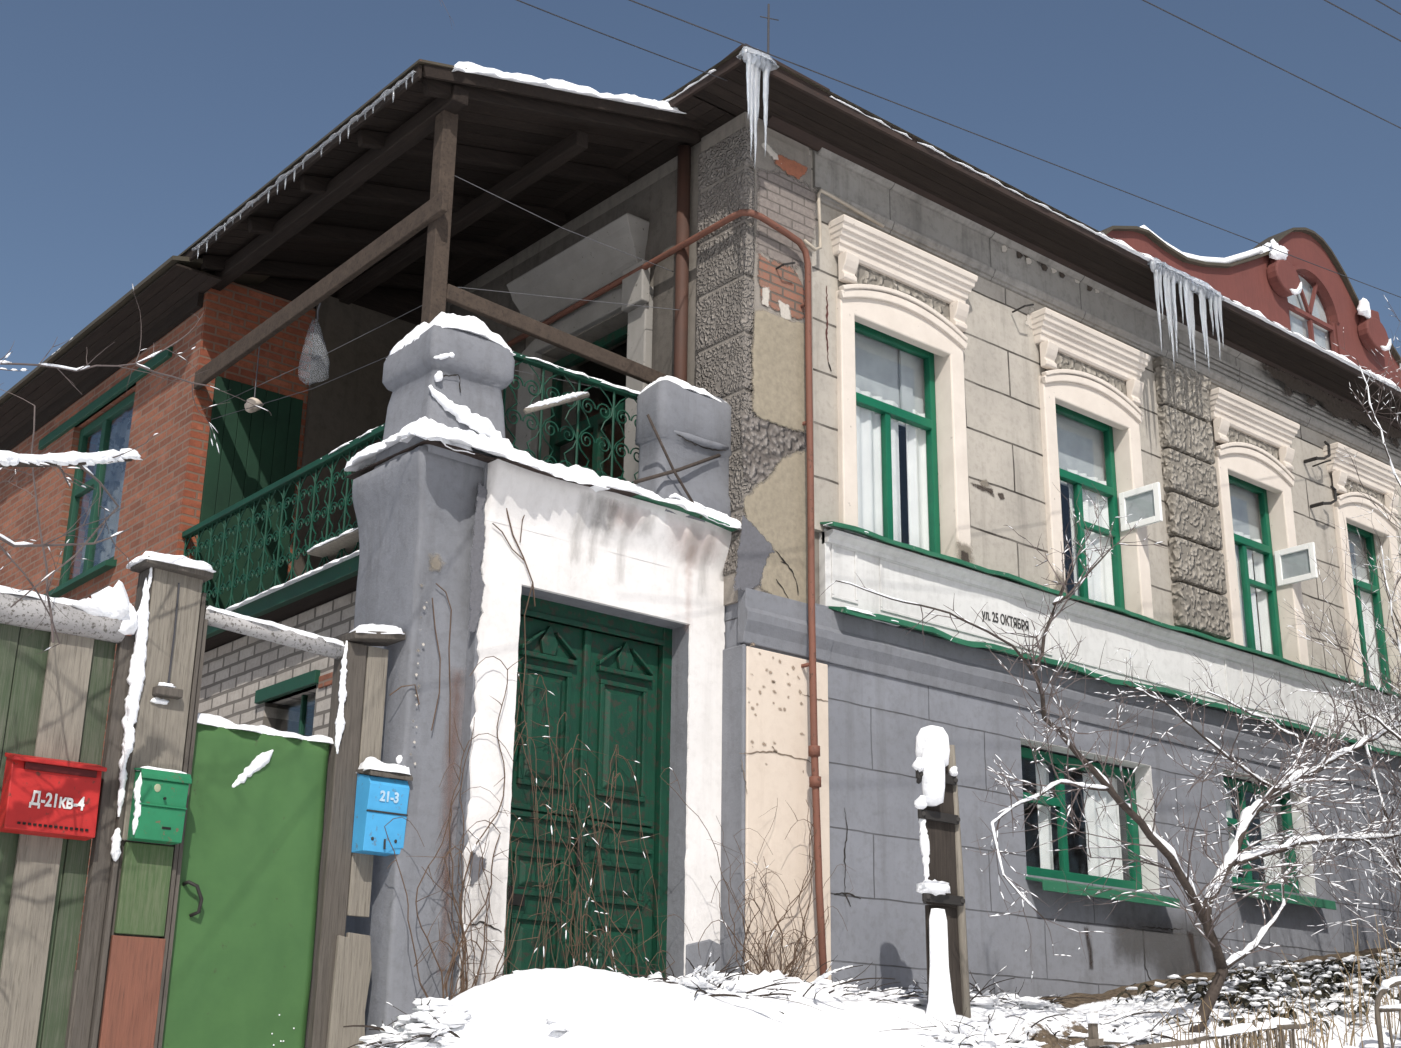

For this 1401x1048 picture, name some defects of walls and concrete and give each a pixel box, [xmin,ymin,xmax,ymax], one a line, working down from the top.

spalling [756,142,817,320]
spalling [741,413,806,484]
peeling [733,516,775,591]
spalling [749,643,802,716]